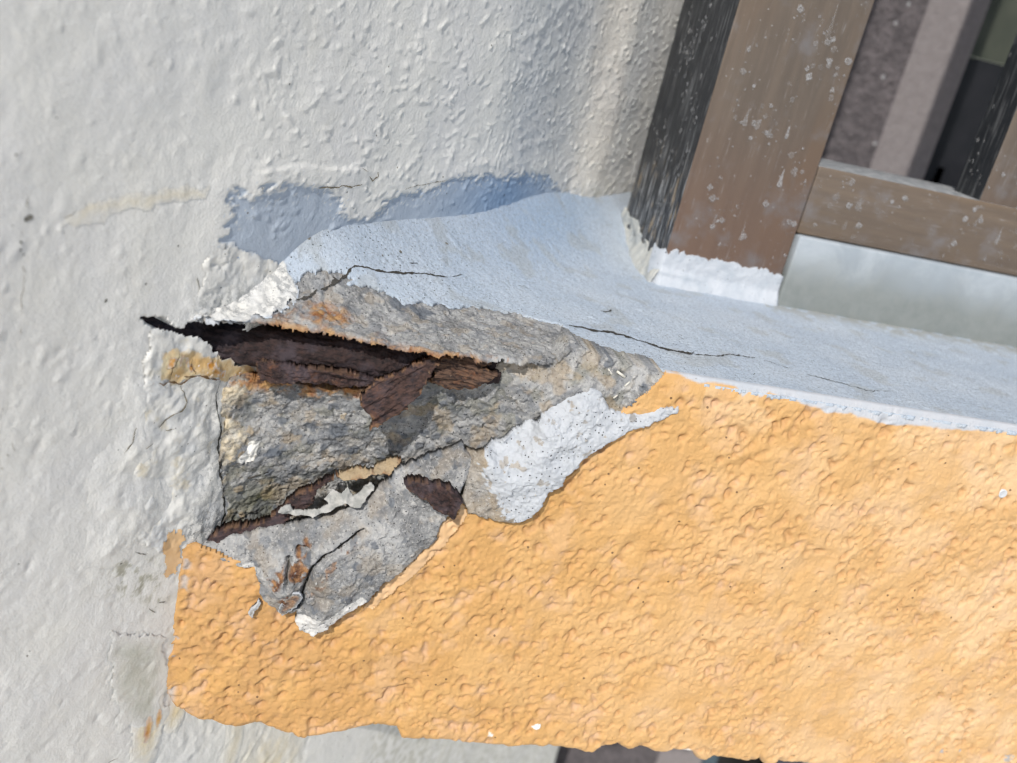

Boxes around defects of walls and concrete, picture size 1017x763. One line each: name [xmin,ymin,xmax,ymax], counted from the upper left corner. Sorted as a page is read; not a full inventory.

crack [290,263,463,300]
rust [140,317,502,431]
crack [569,309,788,375]
spalling [133,241,679,637]
rust [208,470,337,543]
rust [403,474,463,520]